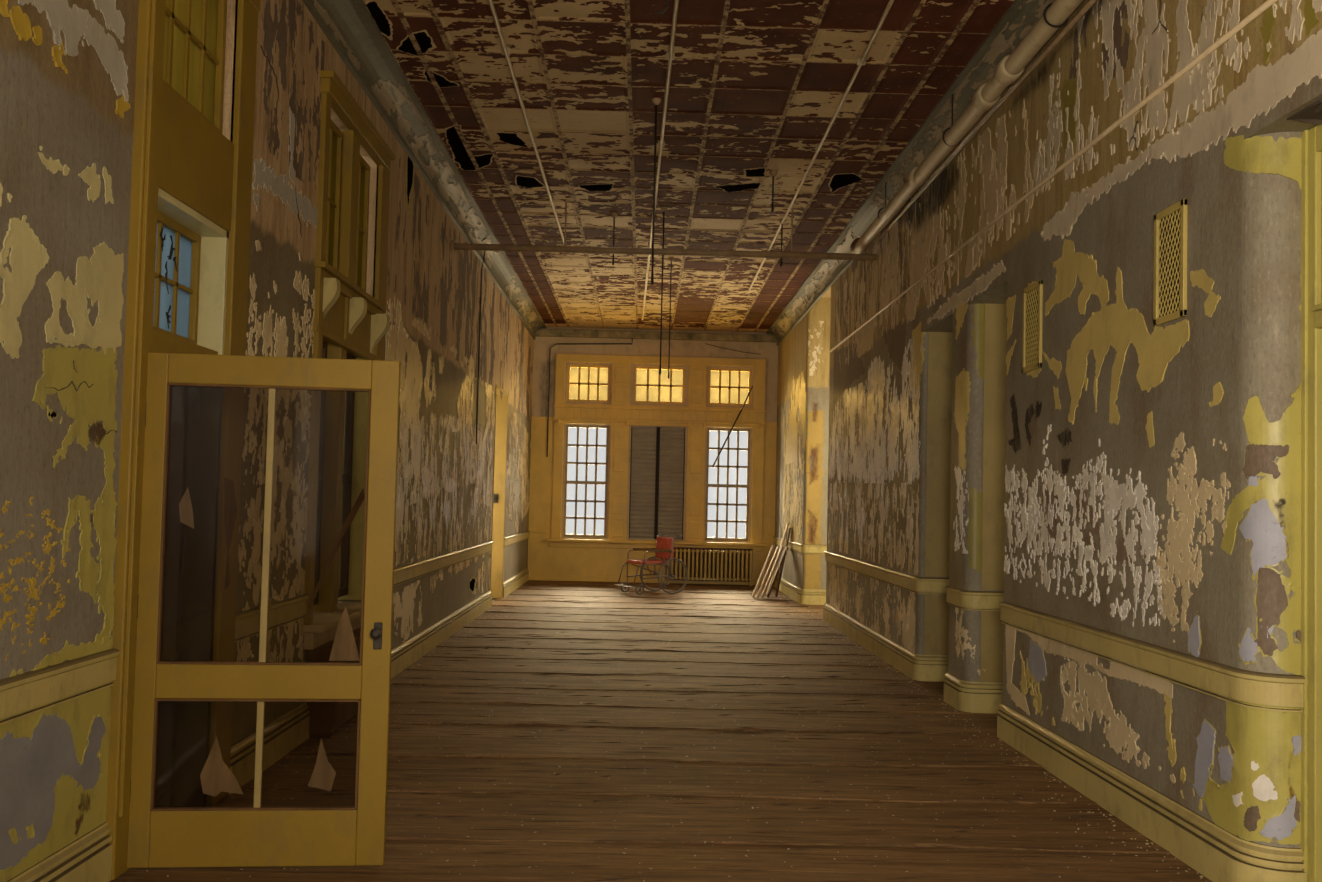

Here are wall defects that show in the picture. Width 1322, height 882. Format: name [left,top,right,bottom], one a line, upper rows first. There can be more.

peeling [0,0,131,118]
peeling [38,146,114,204]
peeling [0,183,124,677]
peeling [238,388,311,611]
peeling [246,0,539,643]
peeling [772,0,1322,675]
flaking render [0,710,106,873]
peeling [237,615,304,662]
peeling [1005,623,1301,845]